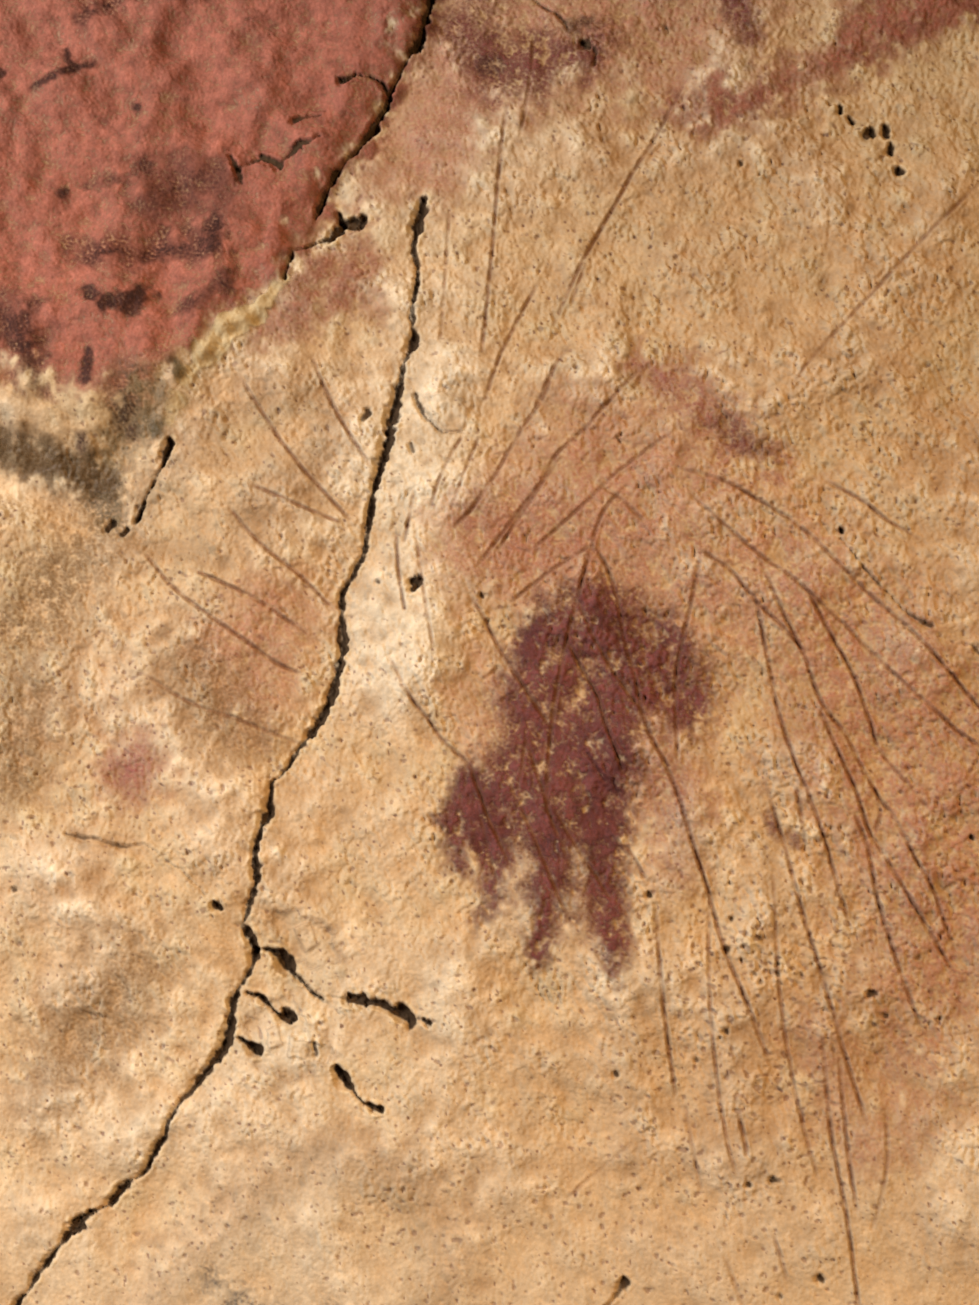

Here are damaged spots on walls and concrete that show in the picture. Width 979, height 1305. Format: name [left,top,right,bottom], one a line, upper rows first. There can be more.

crack [230,117,310,181]
crack [283,0,434,280]
crack [17,196,432,1305]
crack [618,1277,630,1293]